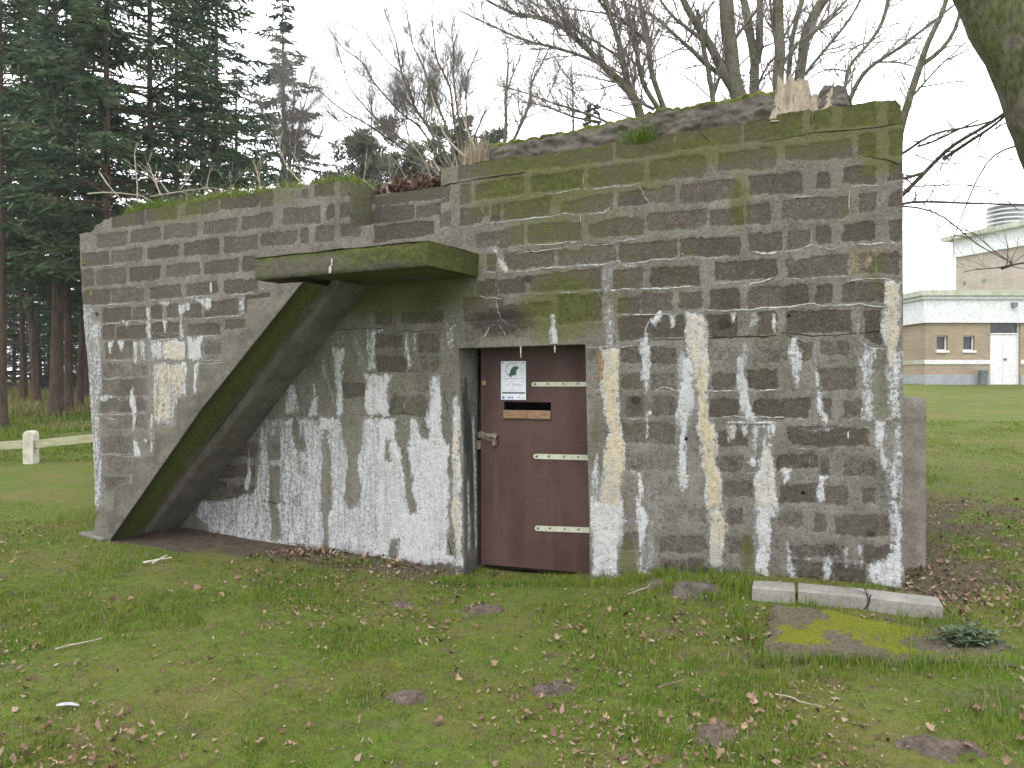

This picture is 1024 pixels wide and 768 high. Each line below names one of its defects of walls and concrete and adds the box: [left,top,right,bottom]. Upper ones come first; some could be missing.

crack [441,172,526,186]
crack [762,113,902,166]
water stain [83,283,212,507]
water stain [196,324,477,568]
water stain [590,307,654,577]
crack [481,178,902,463]
water stain [638,310,792,576]
water stain [785,542,797,578]
water stain [787,338,802,388]
water stain [814,344,829,431]
water stain [816,476,828,502]
water stain [823,280,903,587]